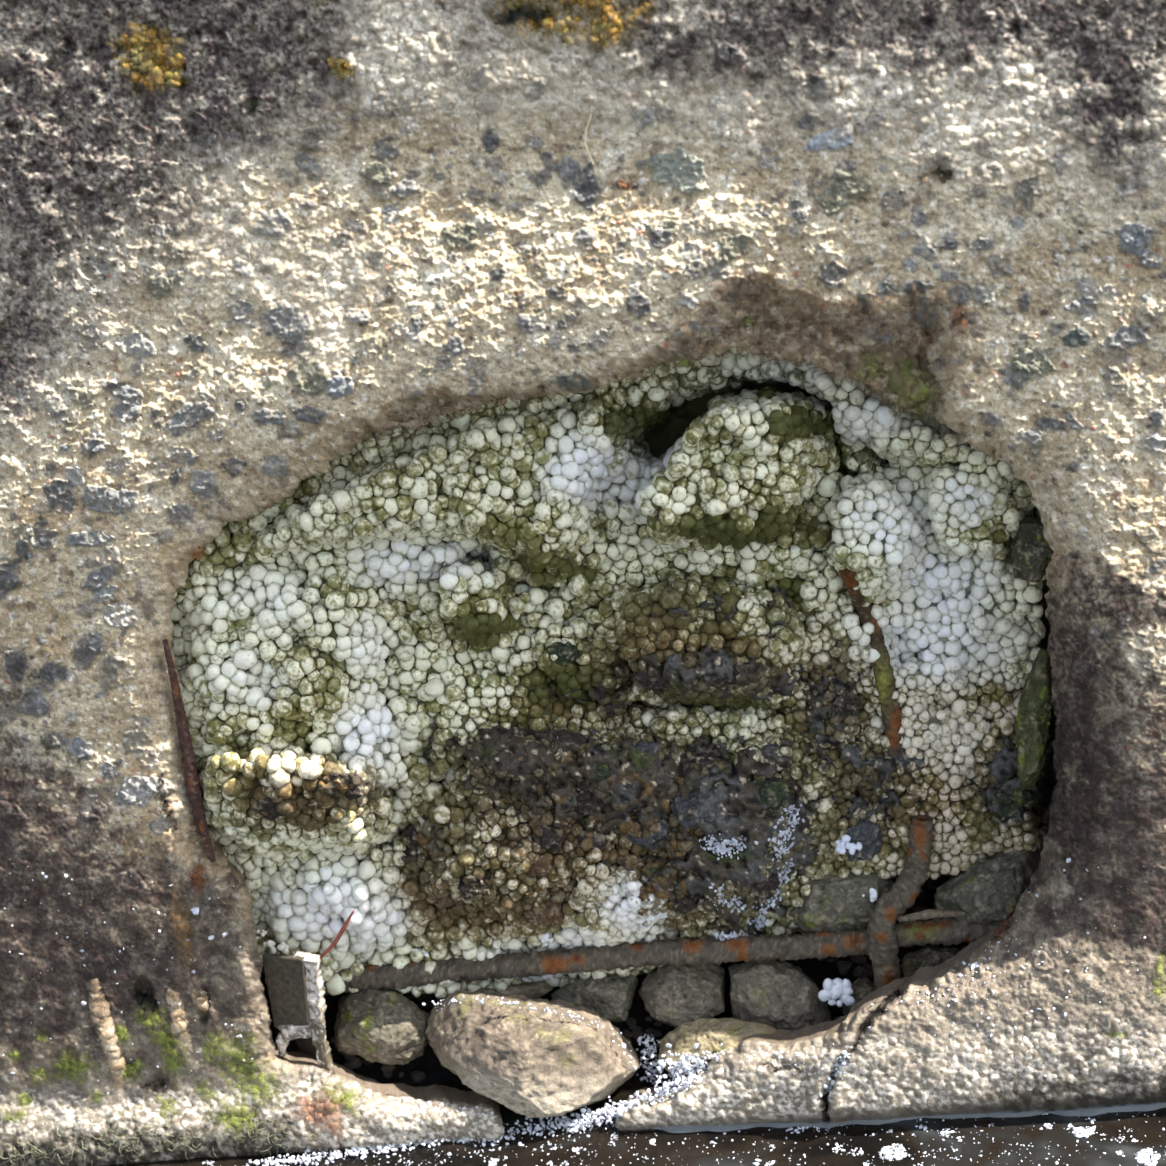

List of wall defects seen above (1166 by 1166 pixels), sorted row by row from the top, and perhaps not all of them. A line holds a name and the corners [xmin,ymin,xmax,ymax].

damp [2,739,23,761]
corrosion [162,639,216,887]
damp [1038,554,1166,950]
damp [0,766,246,1057]
crack [759,1062,799,1073]
crack [823,989,901,1123]